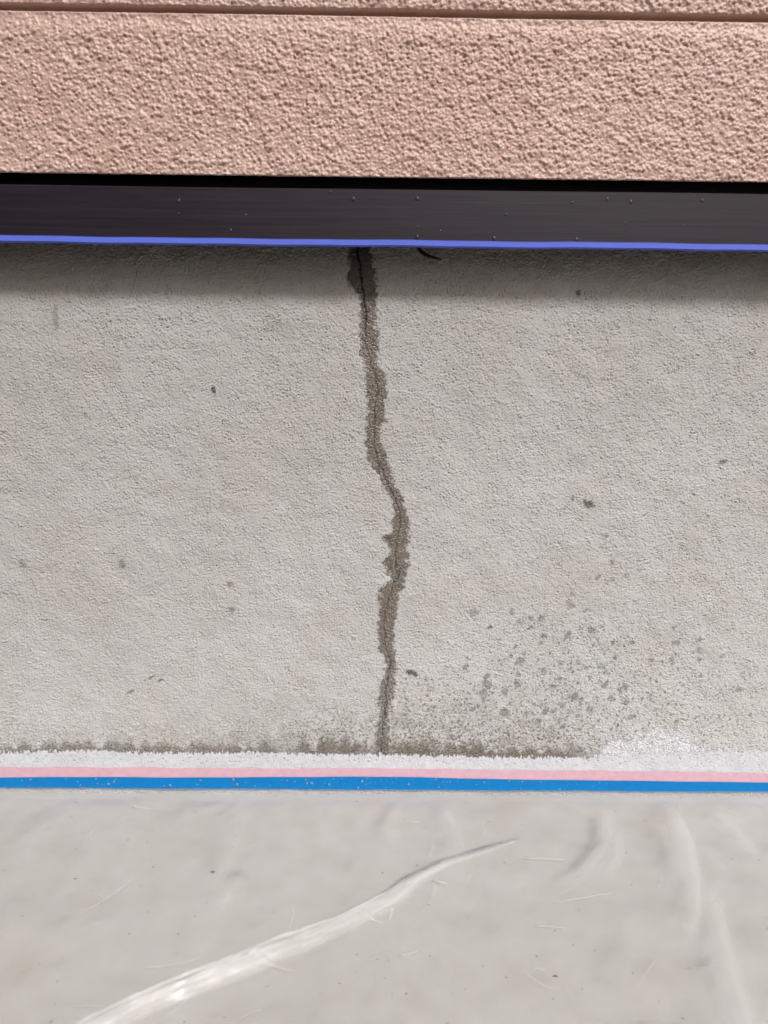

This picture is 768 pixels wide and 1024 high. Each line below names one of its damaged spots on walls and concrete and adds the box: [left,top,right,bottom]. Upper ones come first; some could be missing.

crack [356,247,367,328]
water stain [291,247,576,759]